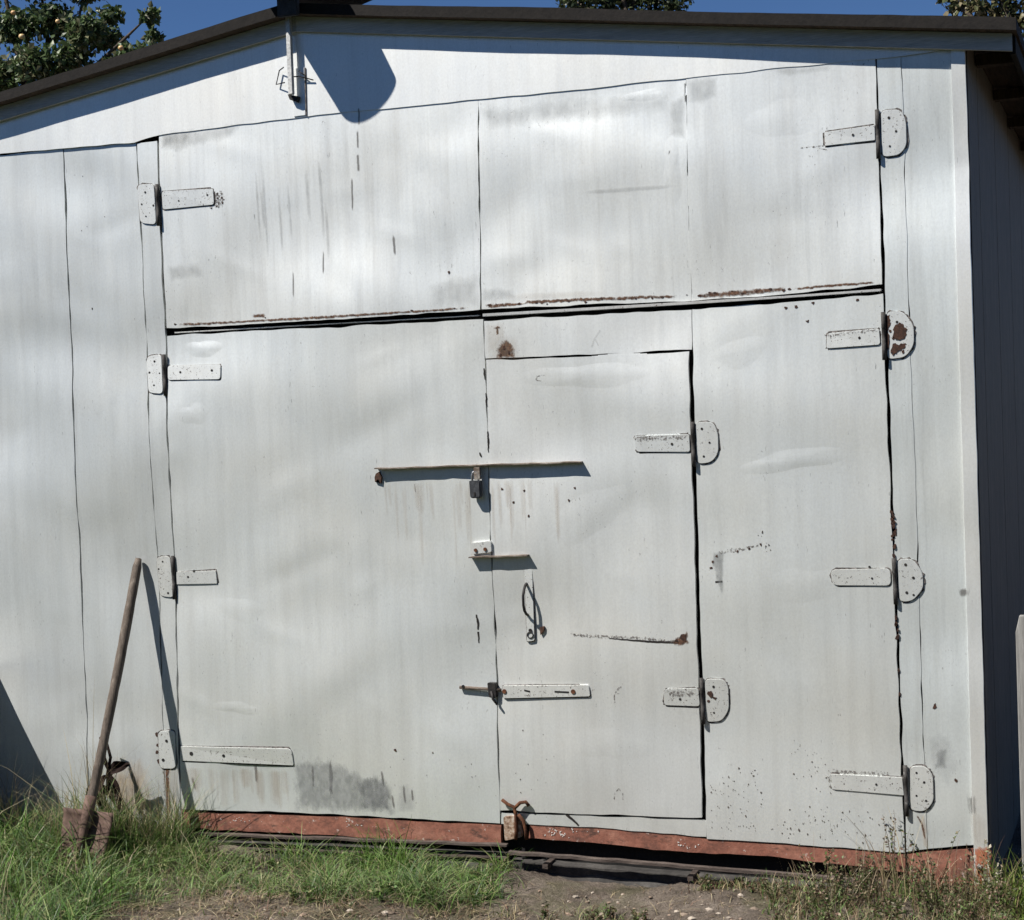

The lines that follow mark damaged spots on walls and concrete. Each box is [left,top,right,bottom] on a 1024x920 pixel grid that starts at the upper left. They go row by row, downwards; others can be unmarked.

rust [487,295,672,308]
rust [496,326,514,358]